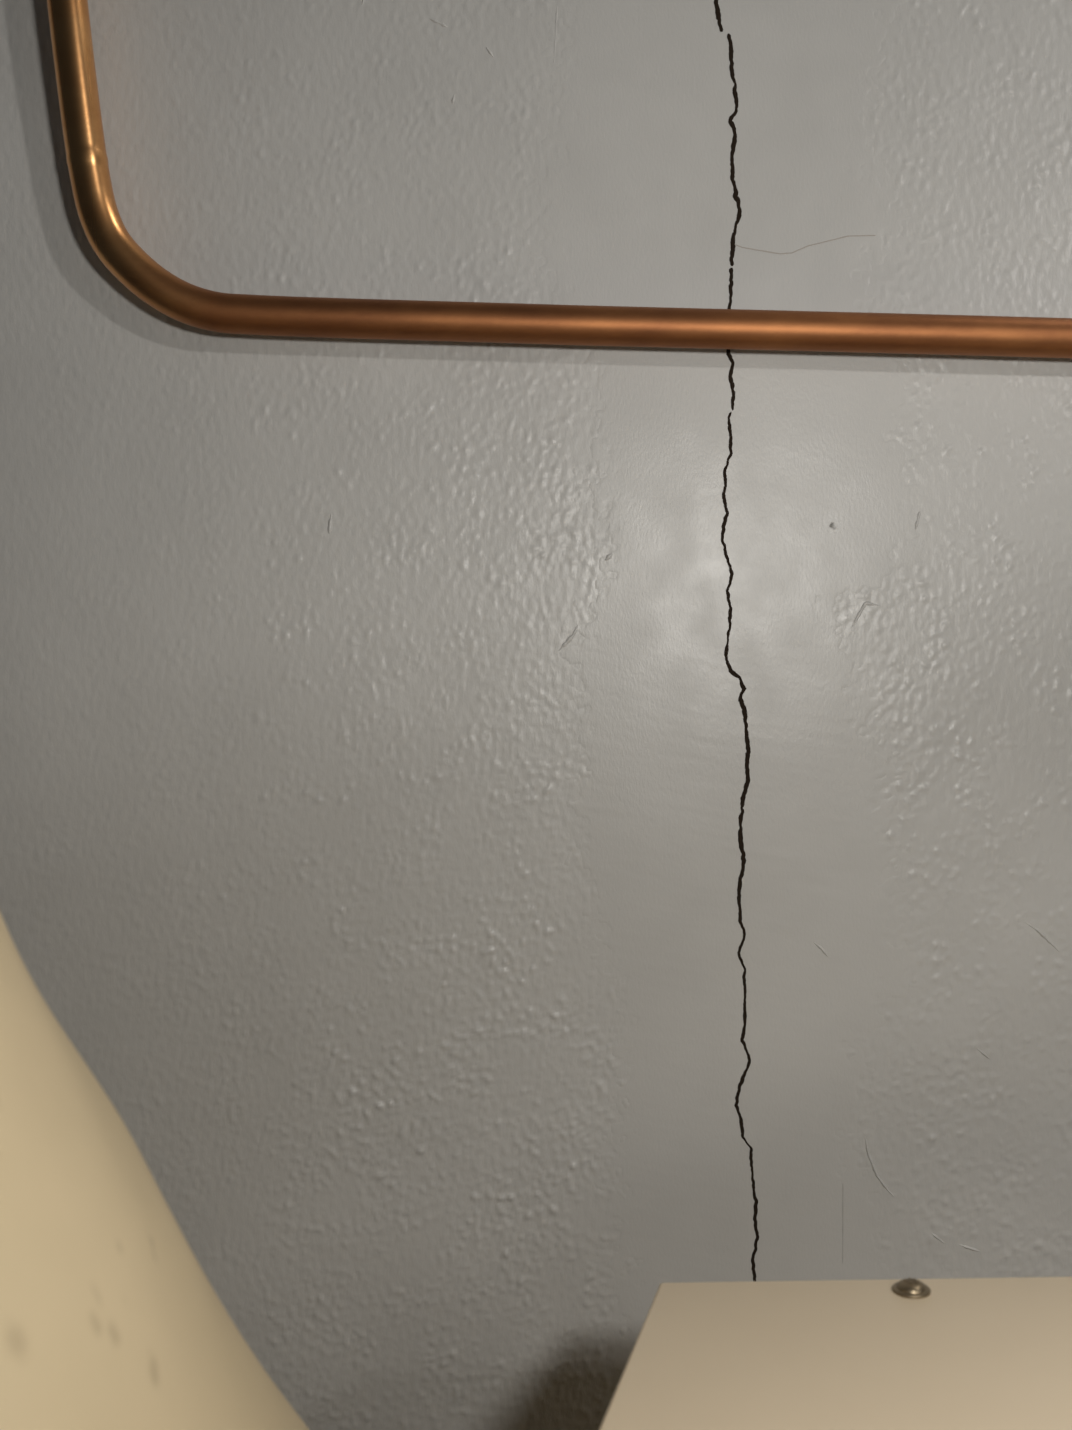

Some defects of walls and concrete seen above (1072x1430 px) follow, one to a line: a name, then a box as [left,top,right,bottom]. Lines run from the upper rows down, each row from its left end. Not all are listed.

crack [714,0,876,309]
crack [721,349,759,1281]